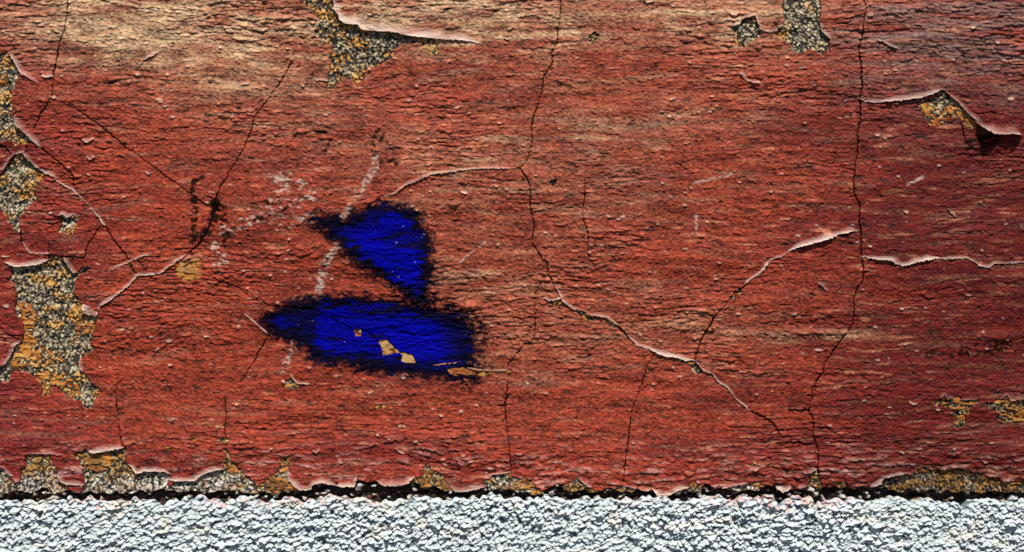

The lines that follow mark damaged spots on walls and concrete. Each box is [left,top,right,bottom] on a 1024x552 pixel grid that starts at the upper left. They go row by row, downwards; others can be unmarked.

spalling [304,0,481,89]
spalling [729,0,832,55]
spalling [0,53,60,232]
crack [0,0,295,315]
crack [370,0,1024,492]
spalling [0,255,102,408]
crack [224,304,338,444]
spalling [933,391,1024,429]
spalling [0,438,357,496]
spalling [377,463,544,495]
spalling [722,481,791,493]
spalling [870,467,1024,493]